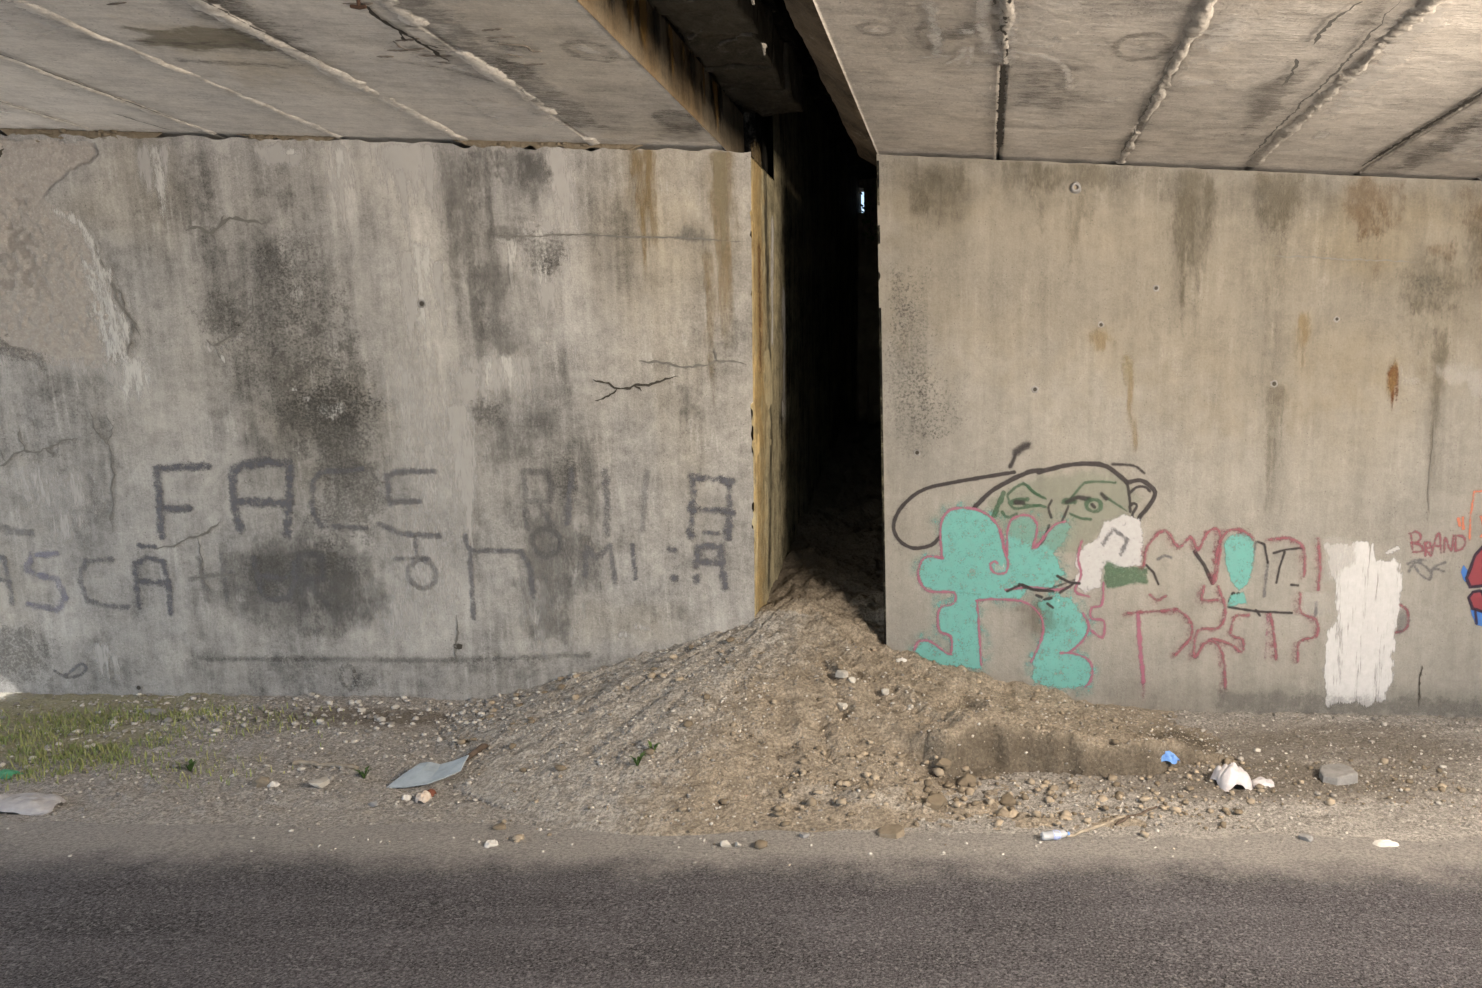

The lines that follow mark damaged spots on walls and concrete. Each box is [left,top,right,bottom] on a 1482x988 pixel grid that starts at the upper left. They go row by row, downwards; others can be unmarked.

crack [991,0,1012,152]
crack [1121,41,1181,153]
crack [1249,0,1401,157]
crack [1362,92,1482,166]
spalling [0,128,162,380]
crack [593,348,746,401]
corrosion [1388,365,1399,405]
crack [0,411,115,537]